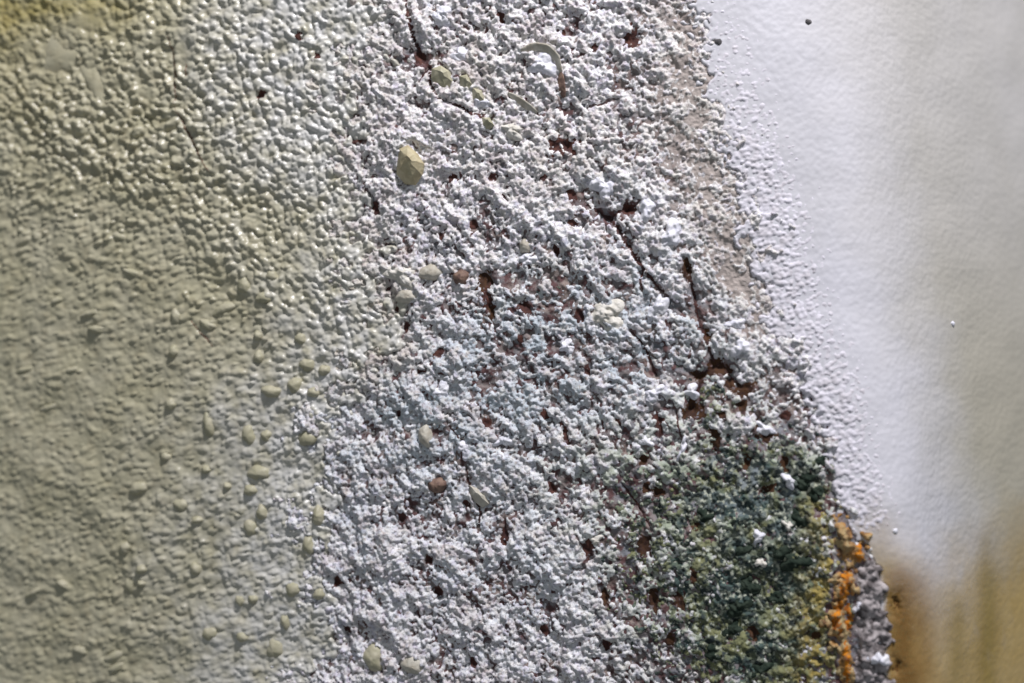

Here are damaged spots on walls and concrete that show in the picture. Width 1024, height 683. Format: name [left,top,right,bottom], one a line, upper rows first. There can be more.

flaking render [310,0,901,683]
water stain [266,0,1024,683]
rust [818,513,873,683]